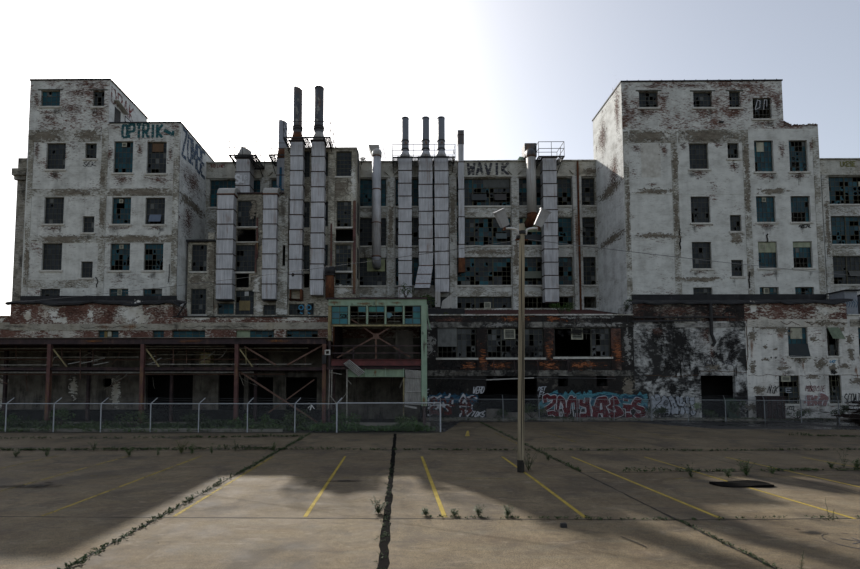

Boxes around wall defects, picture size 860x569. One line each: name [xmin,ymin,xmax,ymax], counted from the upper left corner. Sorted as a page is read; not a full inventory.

spalling [29,82,107,157]
spalling [44,149,206,244]
spalling [596,83,794,264]
spalling [24,226,89,284]
spalling [675,270,728,282]